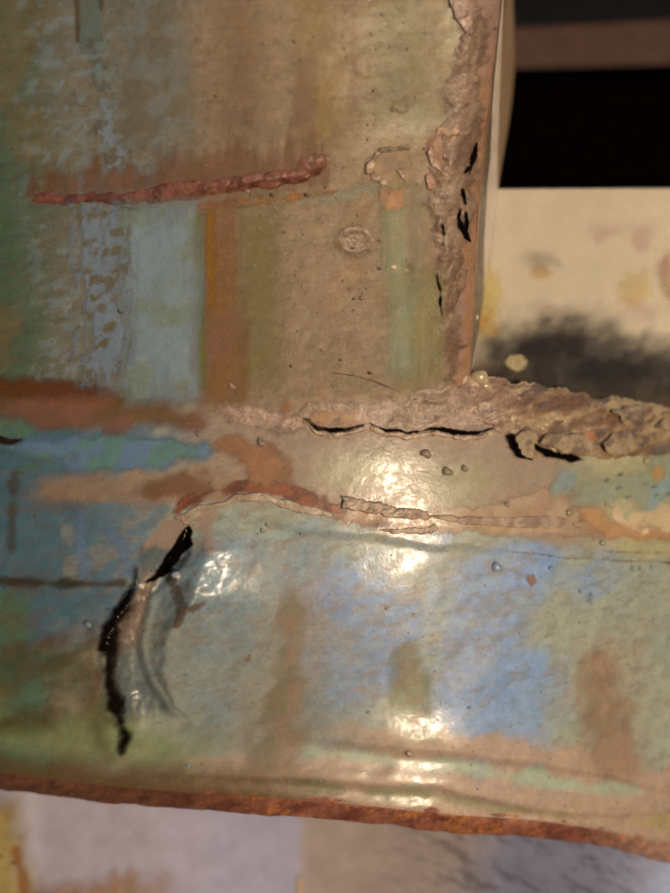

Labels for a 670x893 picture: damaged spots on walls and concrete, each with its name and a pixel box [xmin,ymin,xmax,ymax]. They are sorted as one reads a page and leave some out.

peeling [448,0,477,33]
damp [76,0,127,169]
damp [72,207,197,397]
crack [0,436,23,445]
corrosion [0,379,205,433]
corrosion [214,436,292,488]
corrosion [313,410,361,424]
peeling [515,428,601,460]